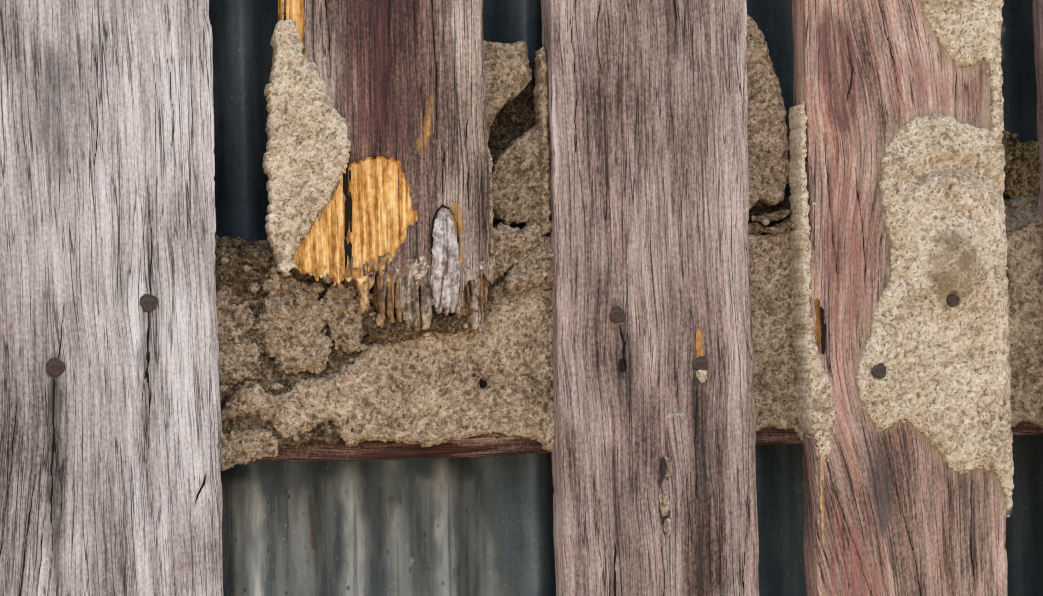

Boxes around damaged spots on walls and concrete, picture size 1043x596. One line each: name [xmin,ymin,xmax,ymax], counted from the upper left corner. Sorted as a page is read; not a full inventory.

crack [195,475,206,503]